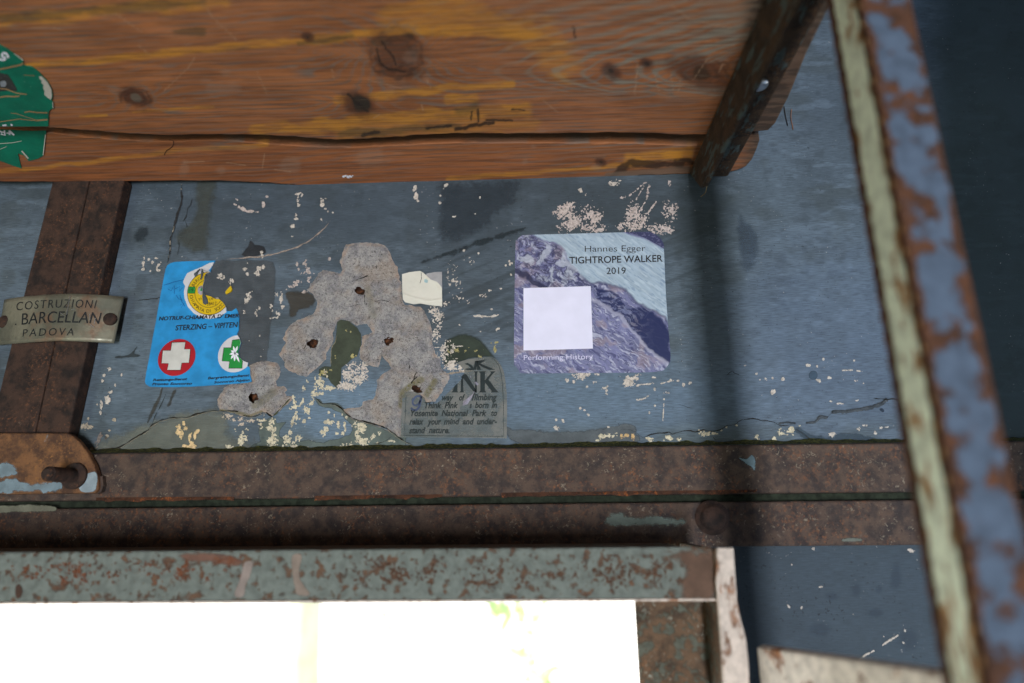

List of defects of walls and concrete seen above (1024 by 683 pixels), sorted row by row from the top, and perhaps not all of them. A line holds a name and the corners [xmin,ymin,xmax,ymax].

peeling [552,179,679,235]
spalling [217,242,502,449]
corrosion [11,553,253,599]
corrosion [351,555,449,592]
corrosion [463,548,715,604]